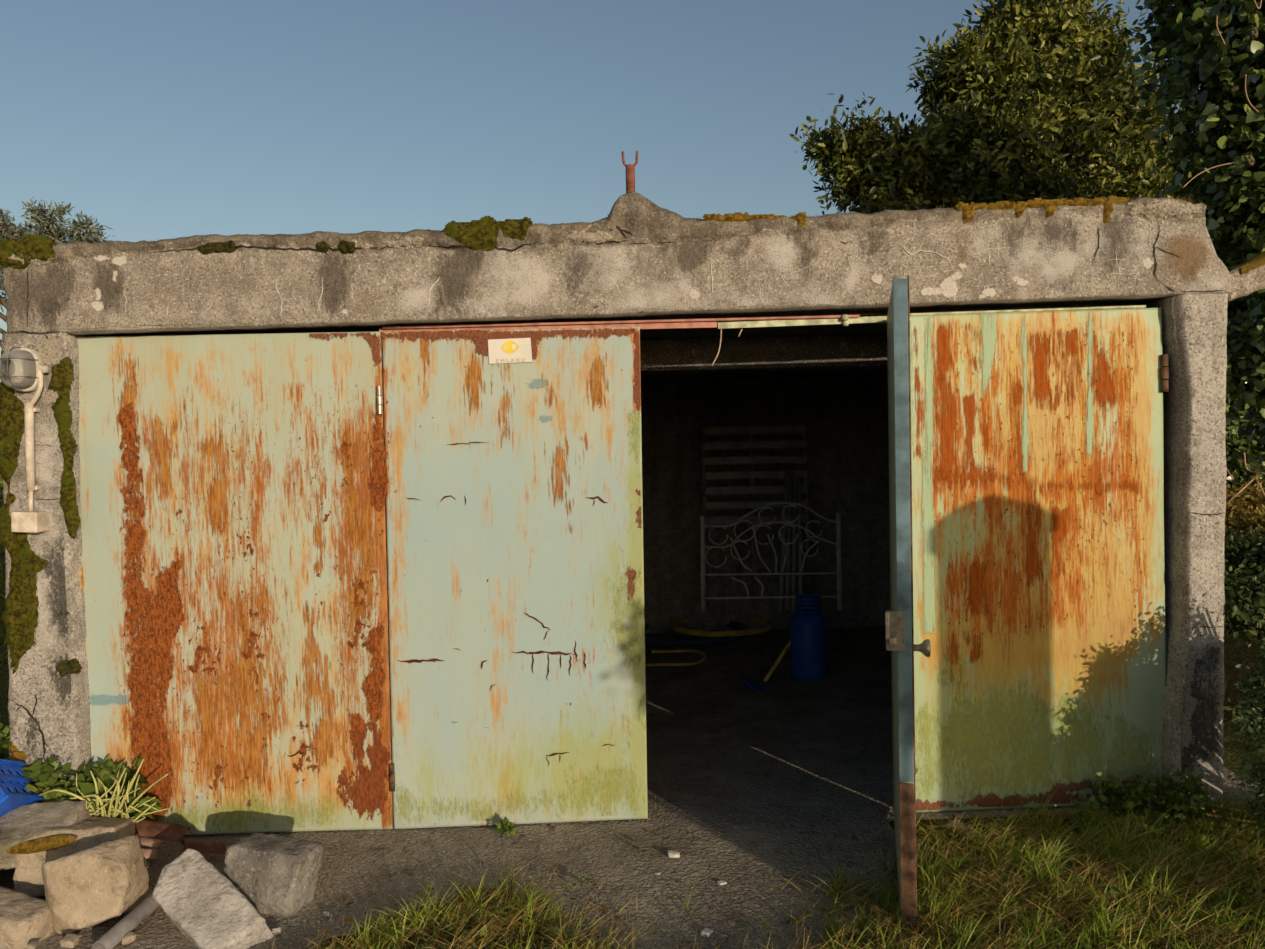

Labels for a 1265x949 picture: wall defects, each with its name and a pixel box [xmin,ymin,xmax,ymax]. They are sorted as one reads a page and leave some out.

water stain [10,266,74,338]
water stain [95,264,124,310]
water stain [320,255,350,311]
water stain [401,244,631,312]
peeling [920,263,967,298]
peeling [979,286,996,298]
rust [309,328,641,448]
rust [544,433,588,531]
water stain [32,509,71,706]
rust [112,353,391,821]
rust [626,568,641,601]
rust [907,275,1161,934]